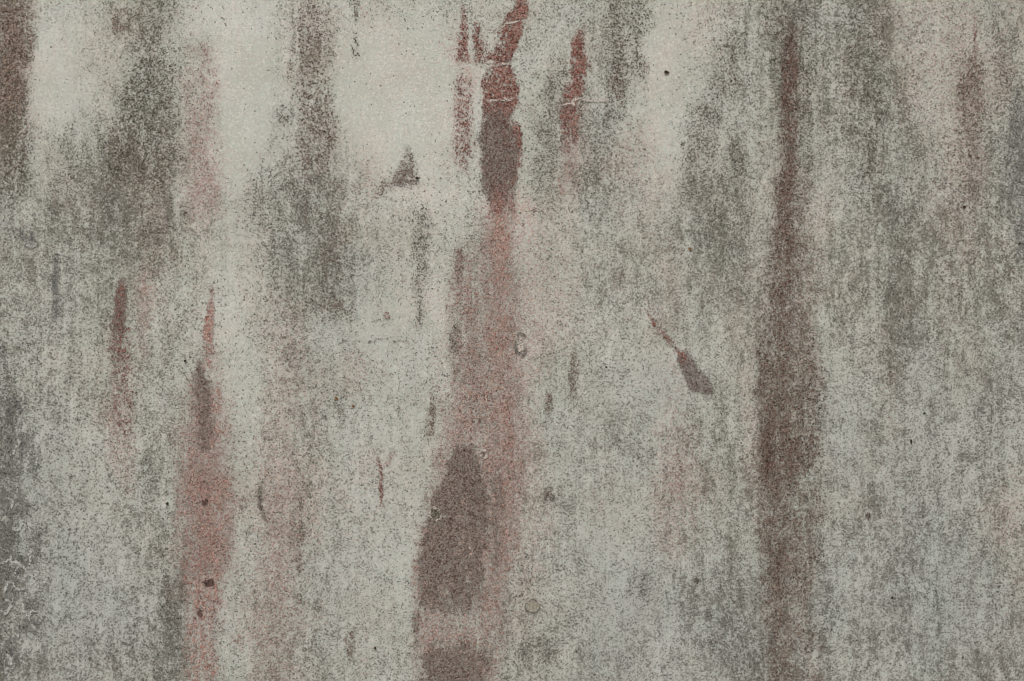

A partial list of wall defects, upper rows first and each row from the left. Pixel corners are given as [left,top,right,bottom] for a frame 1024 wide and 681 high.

leakage [44,0,187,322]
leakage [244,0,362,329]
leakage [370,148,420,199]
corrosion [558,22,593,196]
corrosion [108,267,151,449]
corrosion [168,289,302,681]
corrosion [407,0,529,681]
corrosion [647,311,713,394]
corrosion [750,18,833,681]